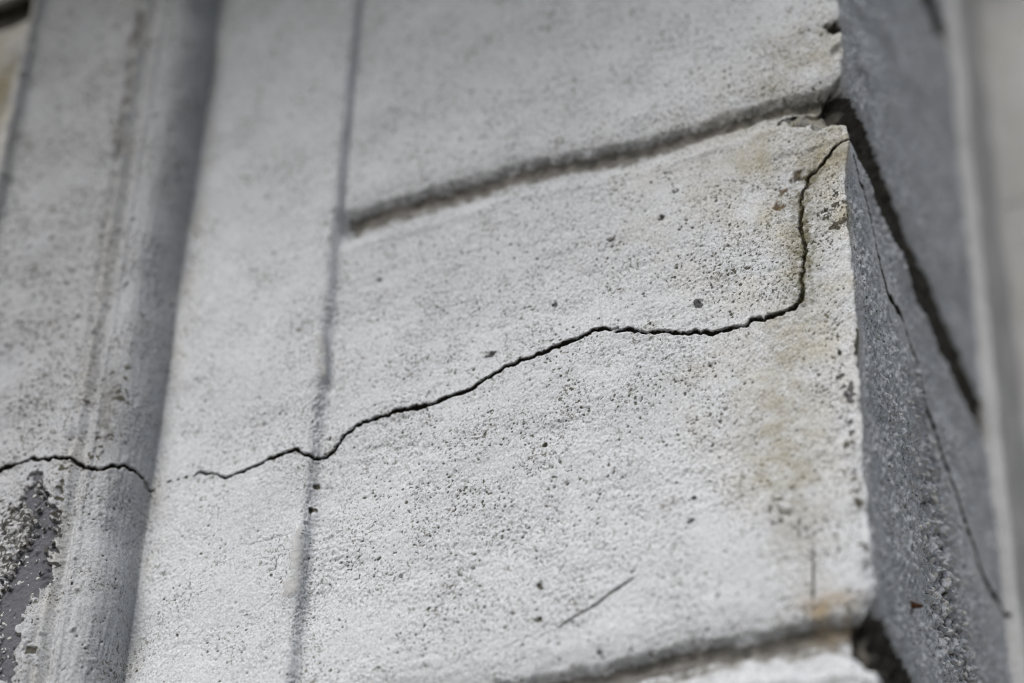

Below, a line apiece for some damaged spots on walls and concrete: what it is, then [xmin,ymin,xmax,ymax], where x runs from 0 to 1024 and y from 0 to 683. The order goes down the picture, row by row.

peeling [0,472,70,683]
crack [0,141,1012,618]